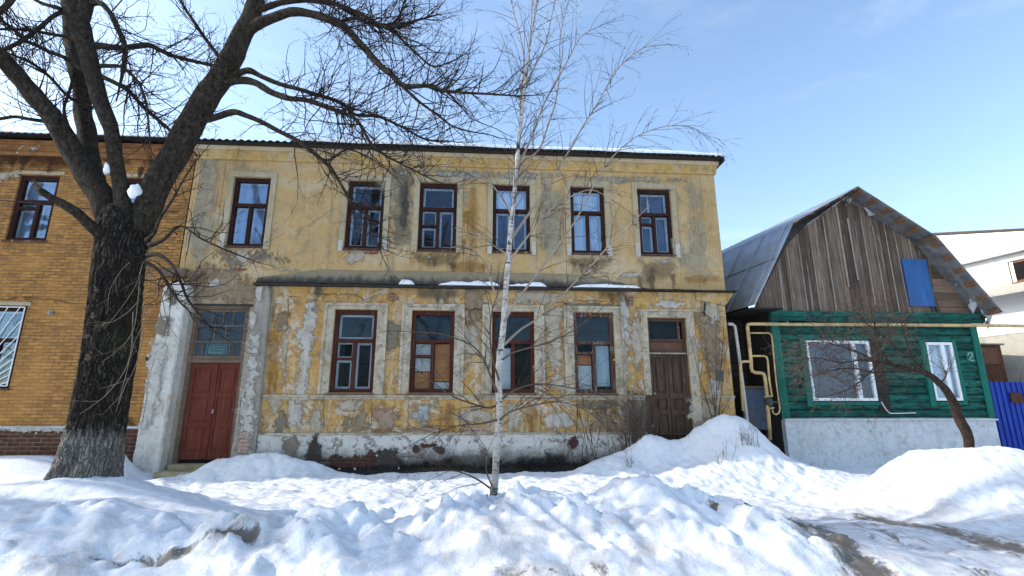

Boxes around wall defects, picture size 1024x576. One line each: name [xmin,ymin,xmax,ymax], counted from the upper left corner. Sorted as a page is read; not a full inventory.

damp [388,166,414,244]
peeling [138,287,178,435]
flaking render [184,159,446,470]
flaking render [461,289,488,359]
peeling [458,400,527,432]
peeling [509,290,656,451]